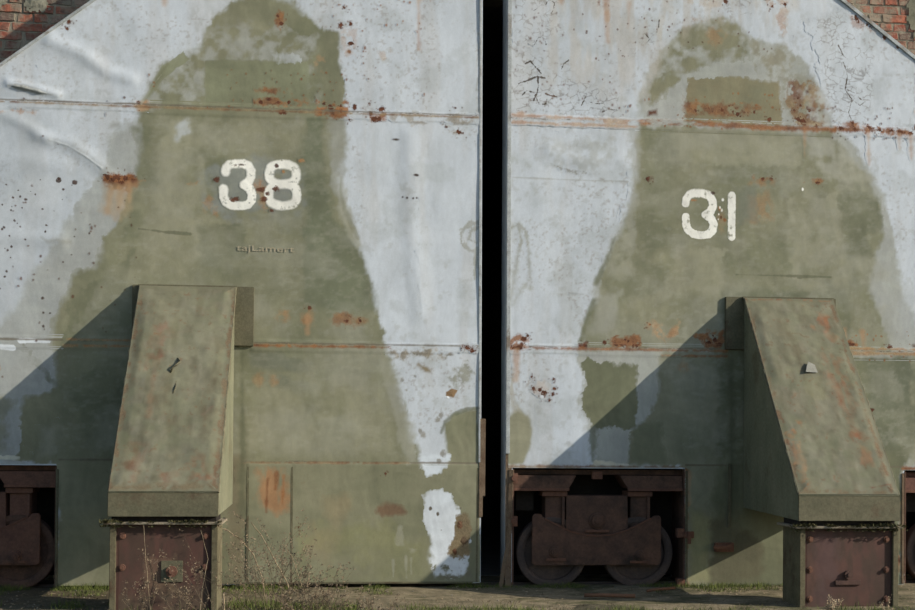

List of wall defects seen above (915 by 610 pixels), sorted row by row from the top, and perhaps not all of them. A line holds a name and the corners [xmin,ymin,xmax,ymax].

peeling [24,0,51,13]
crack [511,0,626,123]
rust [511,0,915,167]
rust [96,168,145,223]
rust [715,206,728,236]
rust [510,318,729,403]
rust [843,326,915,357]
rust [252,464,305,518]
peeling [431,507,474,581]